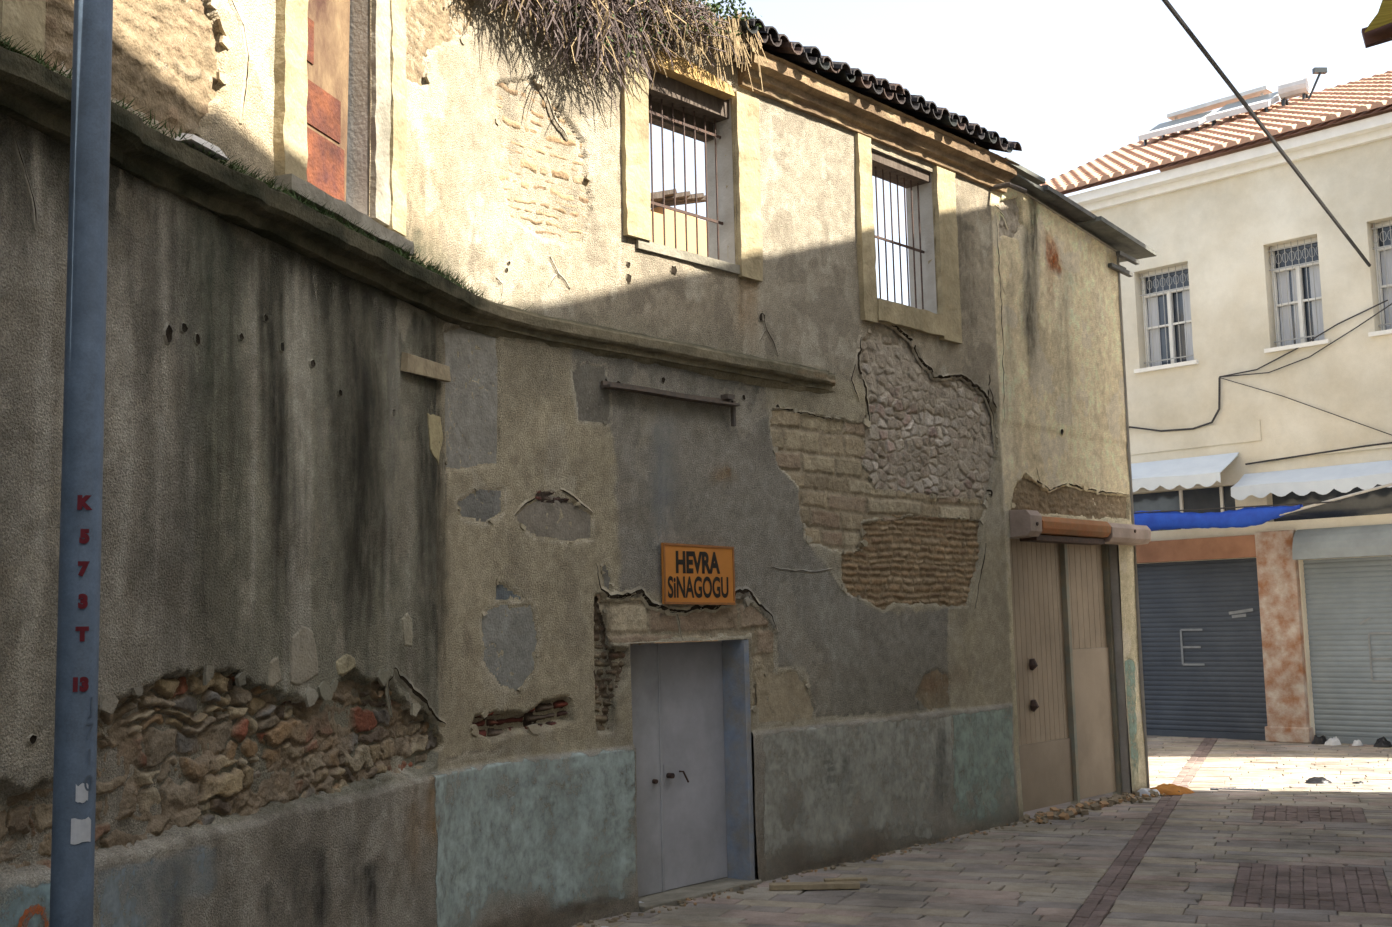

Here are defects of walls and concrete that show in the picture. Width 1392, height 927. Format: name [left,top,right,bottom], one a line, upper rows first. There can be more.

flaking render [41,0,74,71]
flaking render [111,0,233,136]
leakage [261,256,284,544]
leakage [346,294,373,588]
flaking render [427,326,498,469]
flaking render [457,487,591,543]
flaking render [770,323,999,610]
flaking render [1011,475,1127,519]
flaking render [593,564,774,731]
crack [593,562,833,640]
flaking render [95,626,636,927]
flaking render [0,782,53,927]